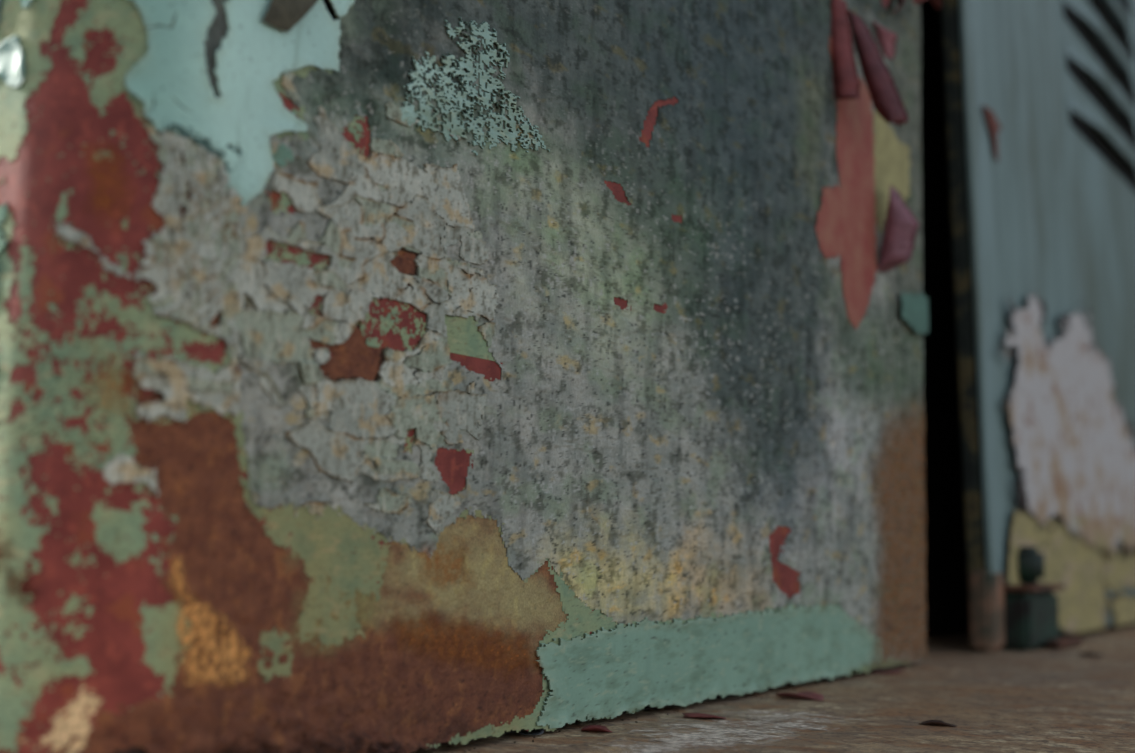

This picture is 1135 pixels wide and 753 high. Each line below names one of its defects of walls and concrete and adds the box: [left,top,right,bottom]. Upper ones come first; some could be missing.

peeling [0,0,242,753]
rust [53,388,568,753]
peeling [424,674,557,750]
peeling [230,0,942,682]
peeling [760,689,824,701]
peeling [999,291,1135,558]